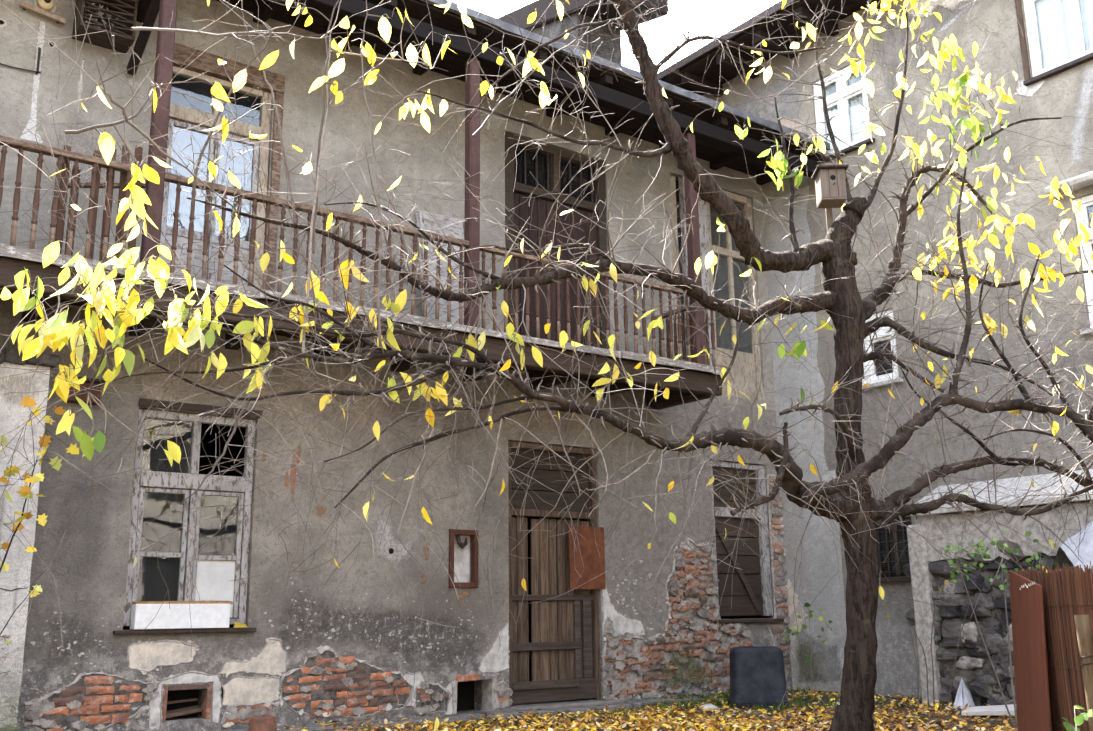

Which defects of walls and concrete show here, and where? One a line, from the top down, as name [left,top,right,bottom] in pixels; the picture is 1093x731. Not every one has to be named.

spalling [0,577,513,731]
spalling [602,538,754,700]
spalling [767,474,809,680]